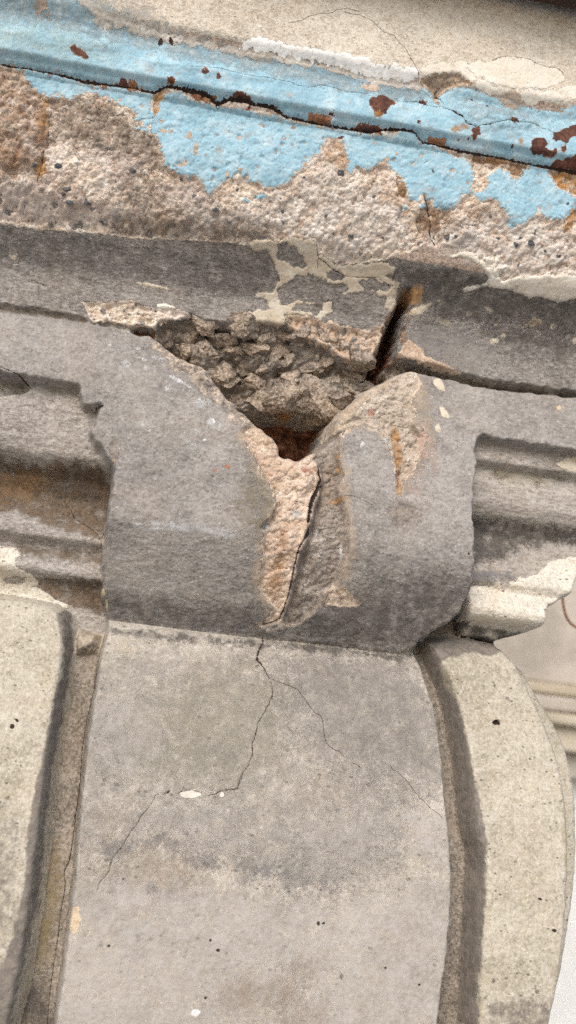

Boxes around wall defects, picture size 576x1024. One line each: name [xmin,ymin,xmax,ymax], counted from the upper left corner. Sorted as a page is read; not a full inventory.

rust [0,73,50,178]
rust [89,76,175,117]
rust [232,90,251,110]
rust [294,110,335,126]
rust [338,95,395,139]
rust [427,125,481,148]
rust [472,155,526,177]
spalling [0,0,576,640]
crack [316,243,404,386]
crack [97,469,361,890]